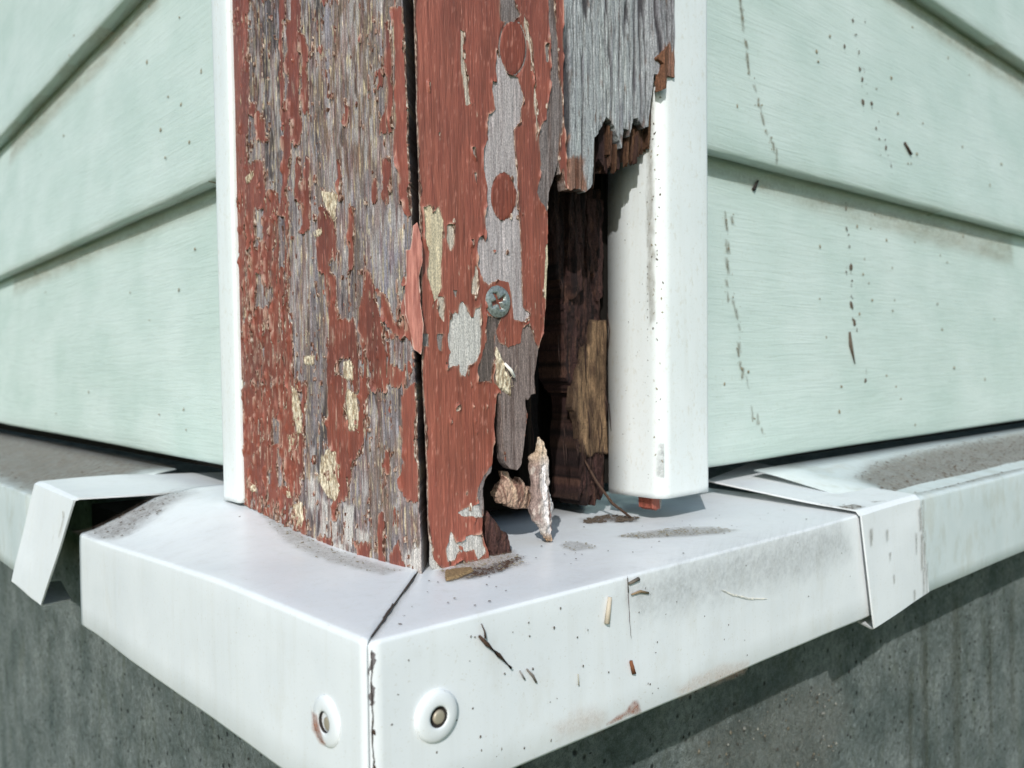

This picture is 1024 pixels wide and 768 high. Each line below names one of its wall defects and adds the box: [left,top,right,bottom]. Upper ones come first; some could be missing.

peeling [232,0,563,574]
peeling [654,44,669,92]